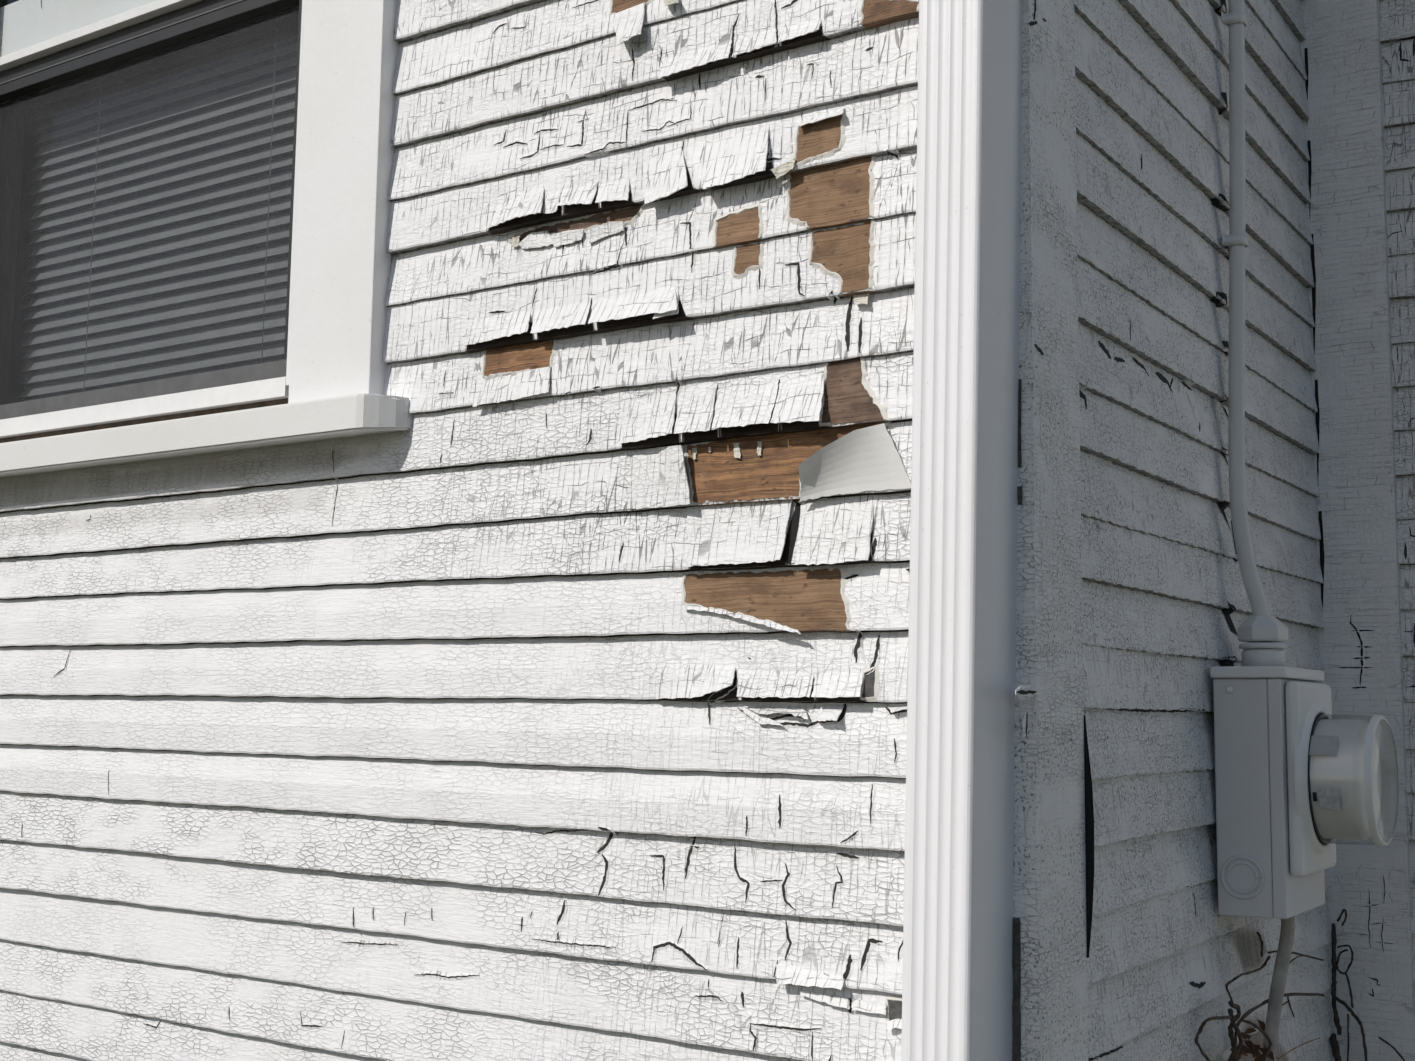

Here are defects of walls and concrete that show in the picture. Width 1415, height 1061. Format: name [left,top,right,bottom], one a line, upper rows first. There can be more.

peeling [609,0,679,44]
crack [493,0,800,163]
peeling [858,0,919,29]
peeling [486,107,877,305]
peeling [463,286,692,407]
crack [561,226,630,322]
crack [756,260,866,353]
peeling [619,357,911,635]
crack [706,657,849,731]
peeling [655,664,907,726]
crack [519,825,617,950]
crack [650,794,903,1061]